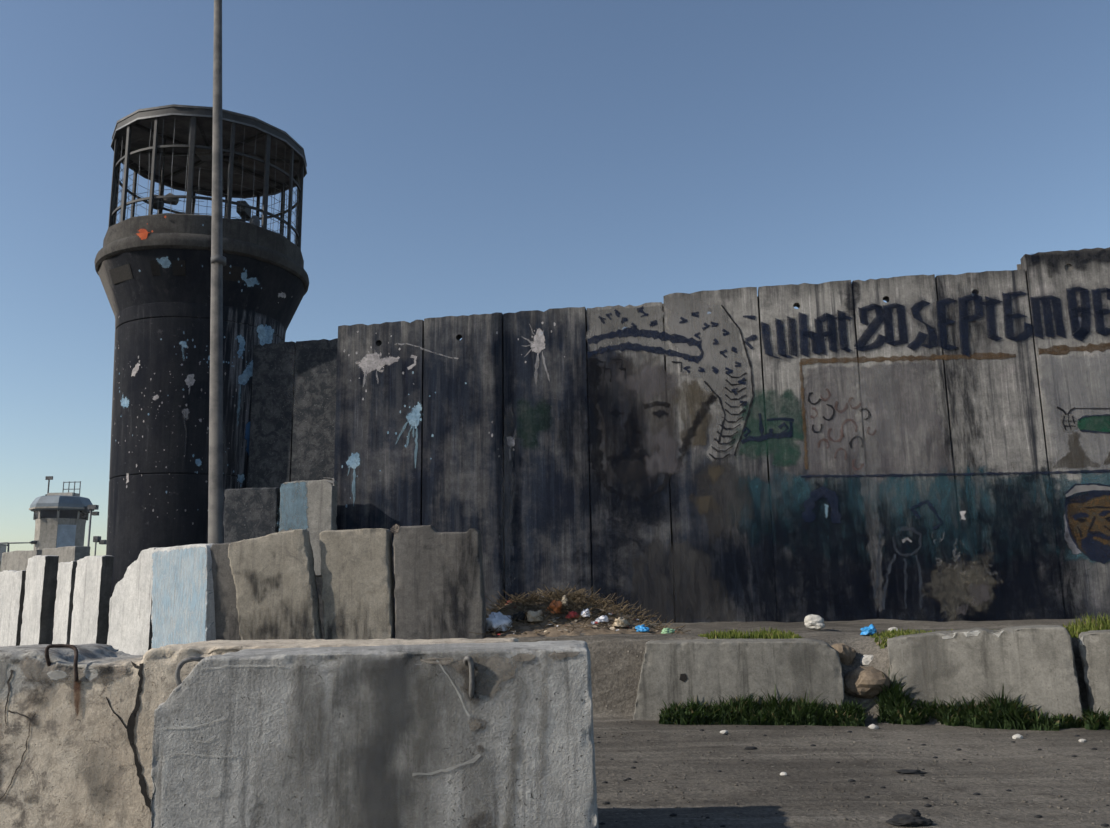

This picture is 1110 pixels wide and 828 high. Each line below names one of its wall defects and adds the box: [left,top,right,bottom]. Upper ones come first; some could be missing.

crack [0,670,36,799]
crack [106,661,151,812]